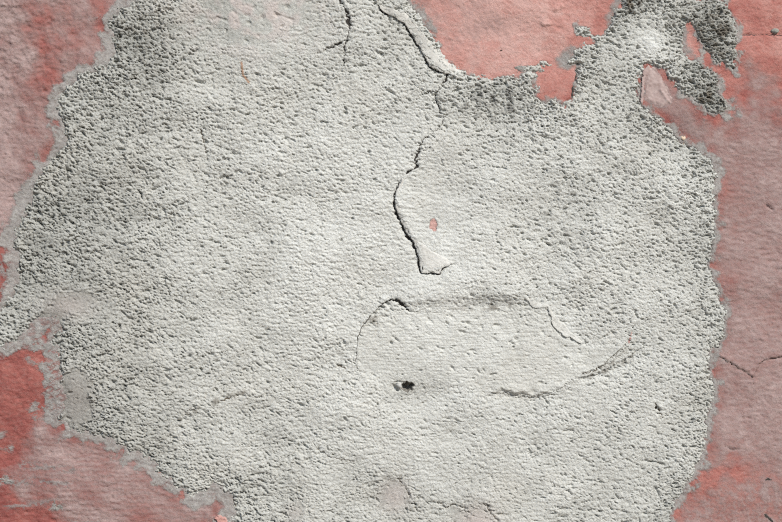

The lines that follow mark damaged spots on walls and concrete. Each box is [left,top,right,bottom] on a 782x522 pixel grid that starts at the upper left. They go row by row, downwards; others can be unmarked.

crack [325,0,351,65]
peeling [379,5,461,74]
peeling [640,65,672,108]
crack [379,7,448,275]
peeling [395,178,450,274]
crack [337,298,409,369]
spalling [357,296,626,399]